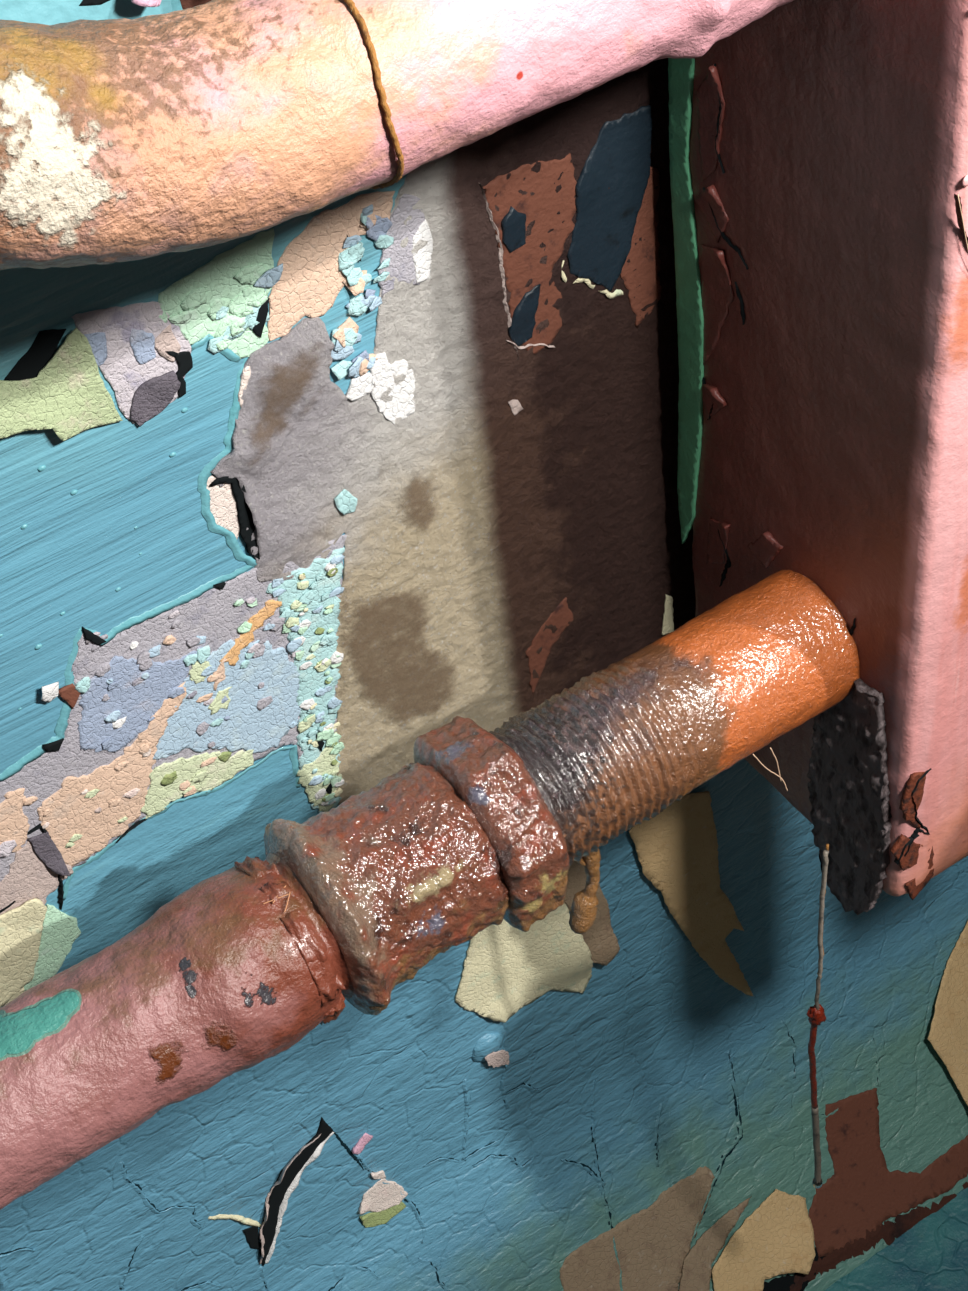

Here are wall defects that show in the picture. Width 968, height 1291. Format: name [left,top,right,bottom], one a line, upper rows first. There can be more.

flaking render [131,0,212,11]
water stain [258,359,315,443]
flaking render [0,58,696,1023]
water stain [351,594,453,720]
peeling [927,920,968,1106]
crack [499,1065,542,1109]
crack [0,1247,36,1291]
crack [118,1117,450,1291]
peeling [559,1166,826,1291]